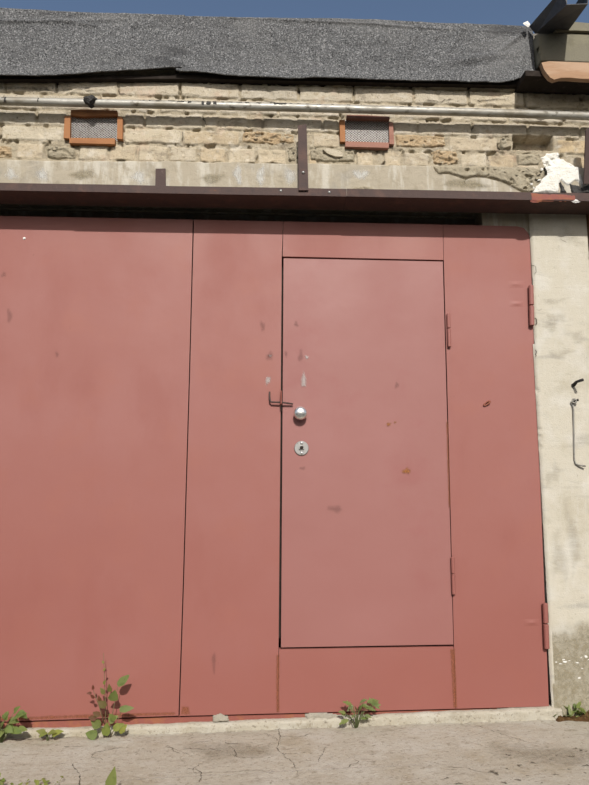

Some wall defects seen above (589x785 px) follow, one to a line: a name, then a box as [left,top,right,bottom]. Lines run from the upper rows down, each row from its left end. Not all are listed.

water stain [553,629,589,717]